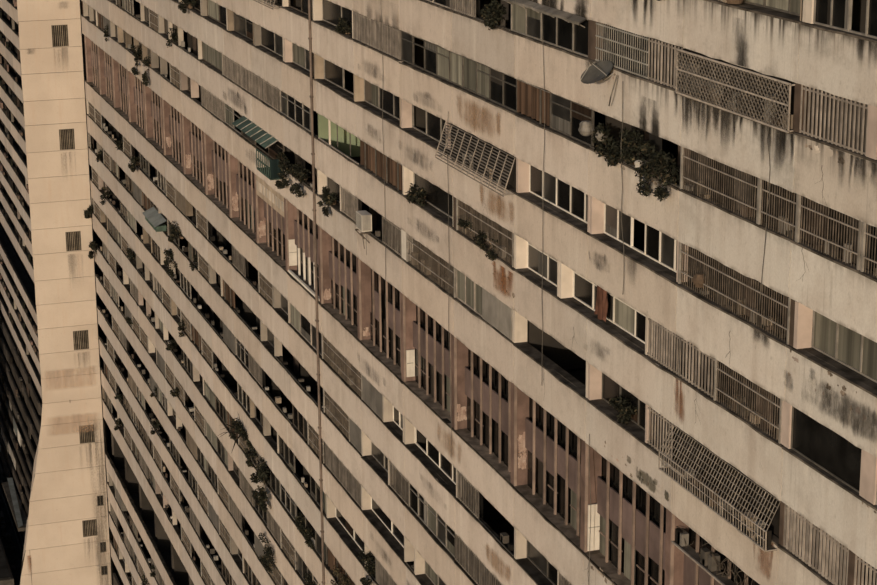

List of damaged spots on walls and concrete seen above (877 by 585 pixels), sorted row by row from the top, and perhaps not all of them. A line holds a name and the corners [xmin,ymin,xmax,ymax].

leakage [529,0,563,11]
leakage [575,3,586,18]
leakage [675,93,742,132]
leakage [754,122,793,158]
leakage [839,151,876,175]
rust [494,261,512,294]
leakage [822,386,877,438]